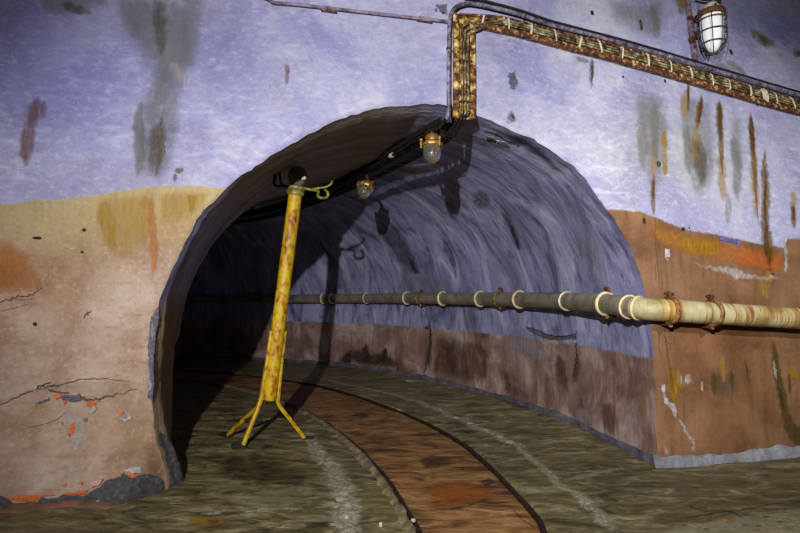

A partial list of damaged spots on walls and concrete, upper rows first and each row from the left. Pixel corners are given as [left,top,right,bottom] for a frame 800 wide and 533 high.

leakage [122,1,195,172]
leakage [642,109,667,174]
rust [682,84,703,162]
leakage [686,145,707,179]
rust [653,117,780,280]
rust [716,102,725,192]
crack [0,287,42,311]
spalling [32,392,99,440]
crack [3,378,137,429]
leakage [773,348,800,443]
spalling [0,432,184,505]